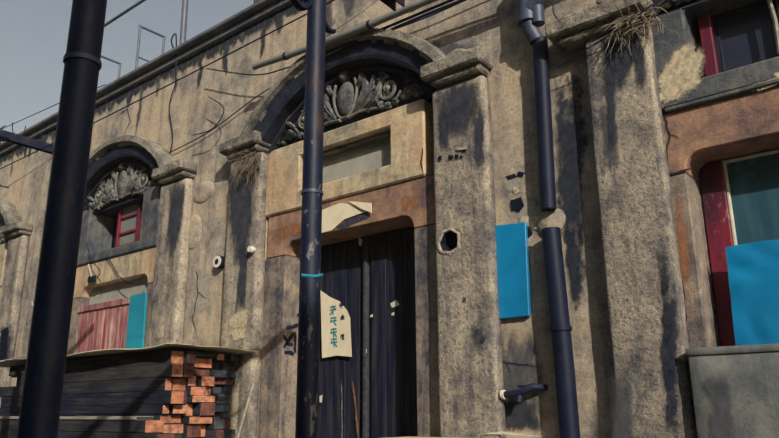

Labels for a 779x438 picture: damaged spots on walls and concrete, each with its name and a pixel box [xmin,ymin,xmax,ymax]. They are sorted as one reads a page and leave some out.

damp [0,146,31,177]
damp [94,0,305,134]
damp [431,42,465,56]
damp [438,82,484,165]
damp [556,75,588,310]
damp [601,29,646,171]
peeling [658,43,704,105]
damp [612,378,632,438]